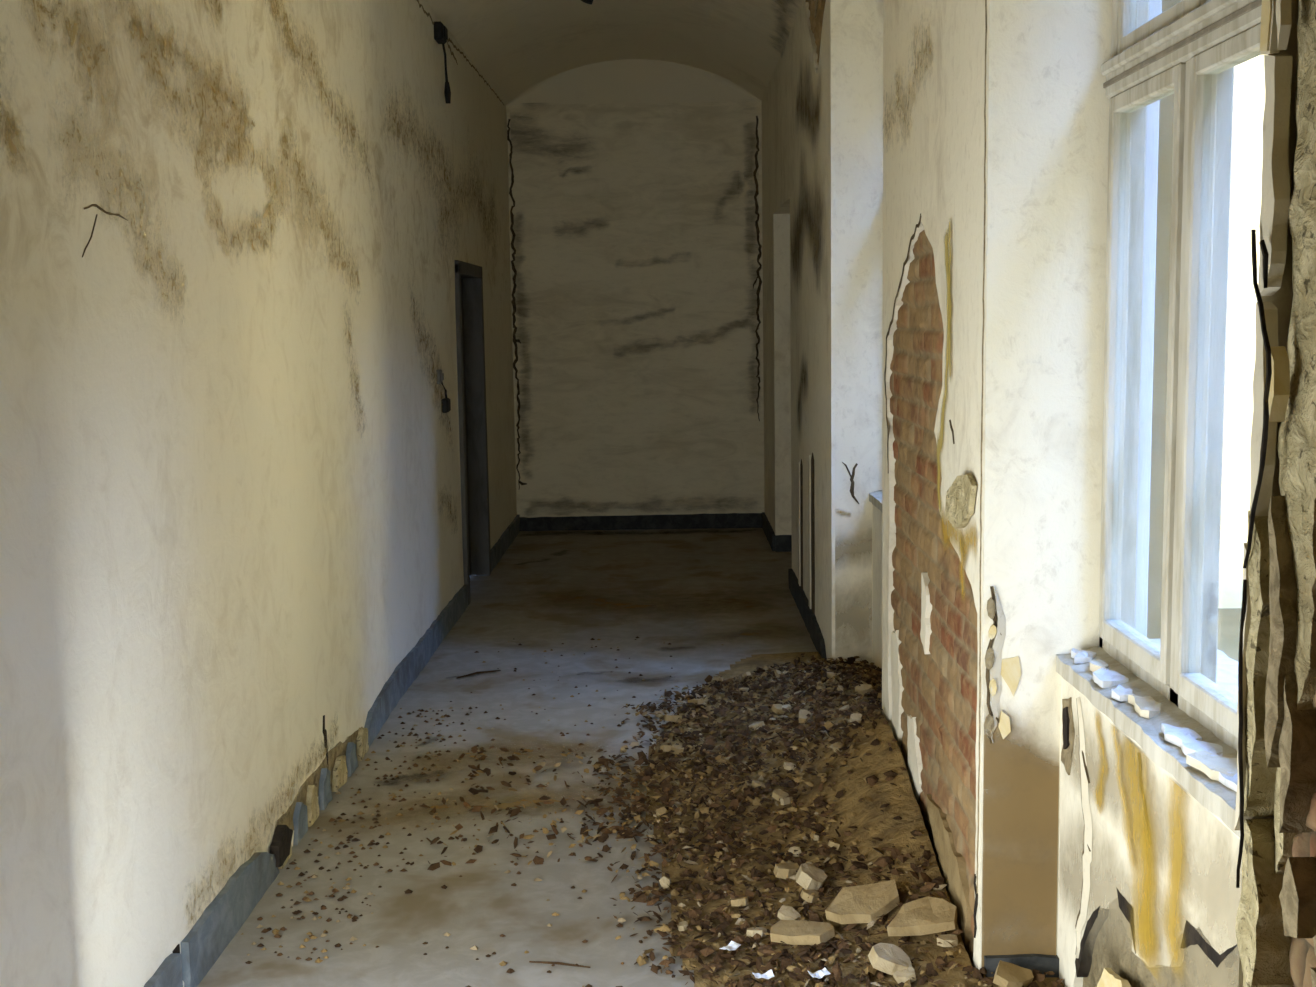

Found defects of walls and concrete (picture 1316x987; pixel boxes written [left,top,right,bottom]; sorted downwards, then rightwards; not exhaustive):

crack [82,204,128,257]
damp [129,14,360,285]
damp [272,0,370,179]
flaking render [890,230,1021,965]
flaking render [1075,0,1316,987]
flaking render [1061,697,1075,775]